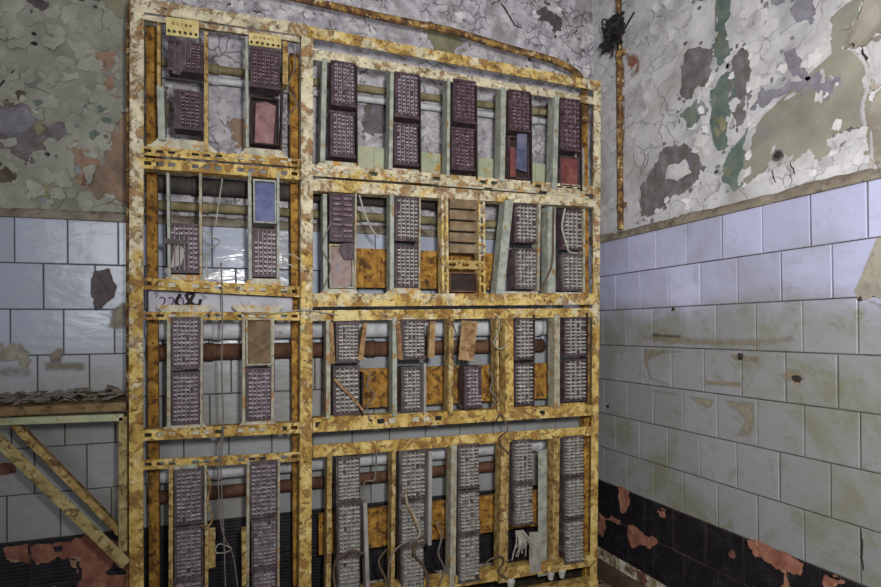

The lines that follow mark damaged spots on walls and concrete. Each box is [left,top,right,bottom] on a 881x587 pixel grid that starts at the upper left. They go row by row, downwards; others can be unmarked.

peeling [157,0,386,41]
peeling [0,0,129,211]
peeling [158,56,250,179]
peeling [313,61,330,157]
peeling [348,45,390,147]
peeling [420,0,881,234]
peeling [158,192,253,212]
spalling [90,268,117,311]
spalling [598,486,658,549]
spalling [3,534,126,587]
spalling [747,539,803,587]
crack [858,529,866,571]